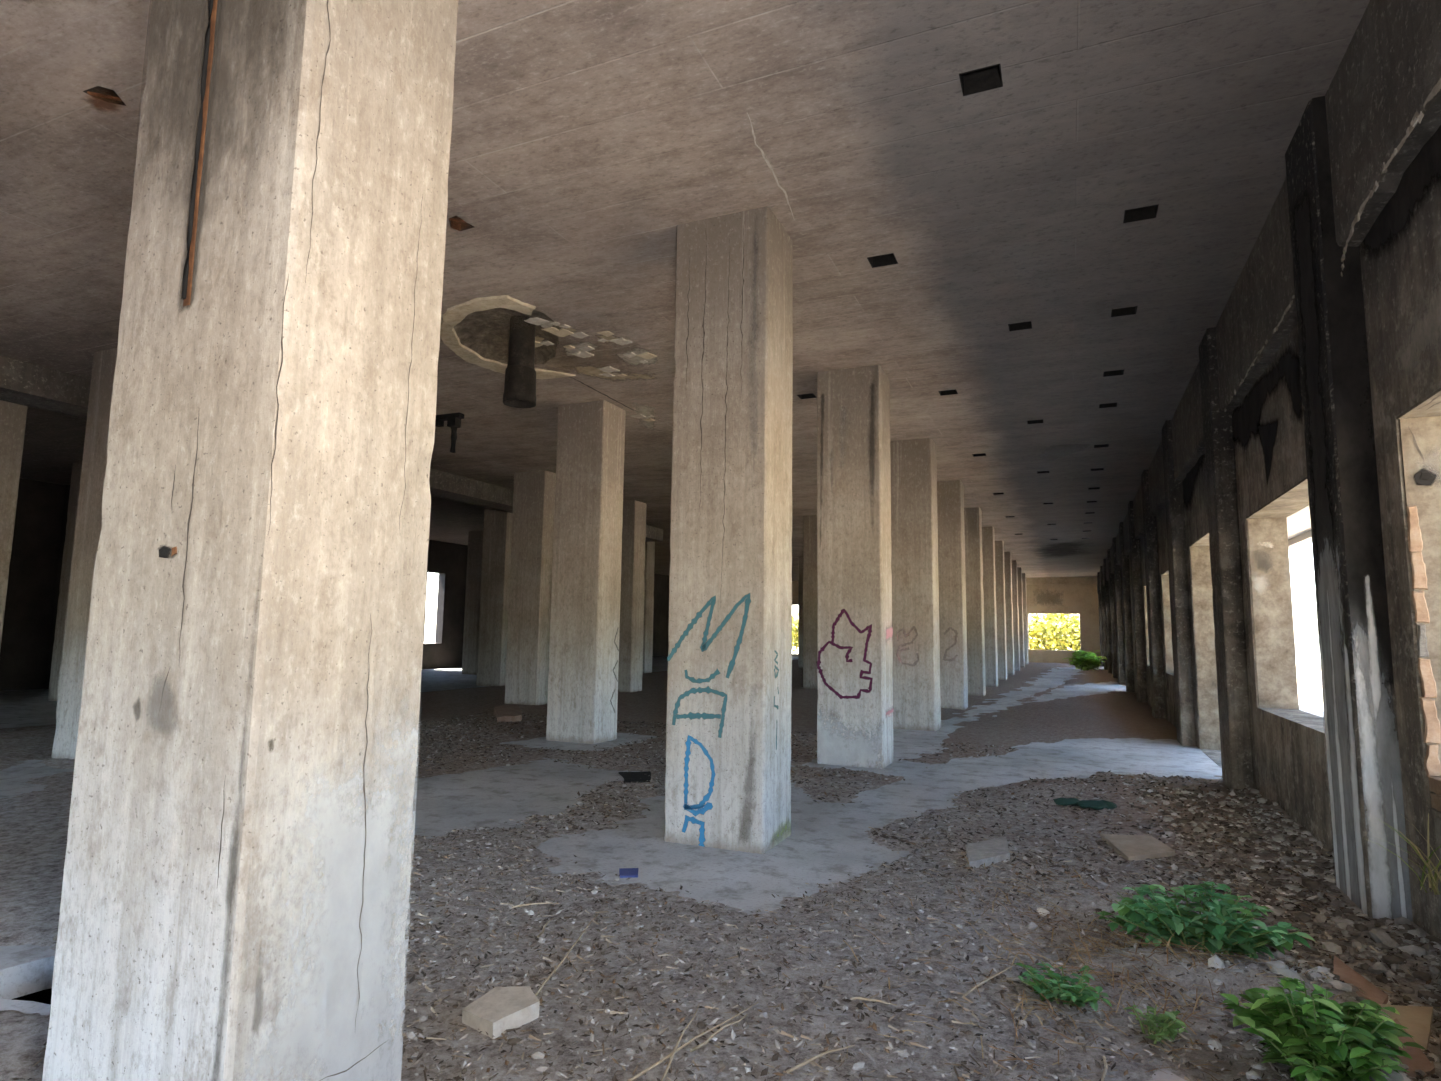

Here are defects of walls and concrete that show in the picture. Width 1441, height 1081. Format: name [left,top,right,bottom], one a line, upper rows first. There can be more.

corrosion [179,0,221,310]
spalling [440,295,657,381]